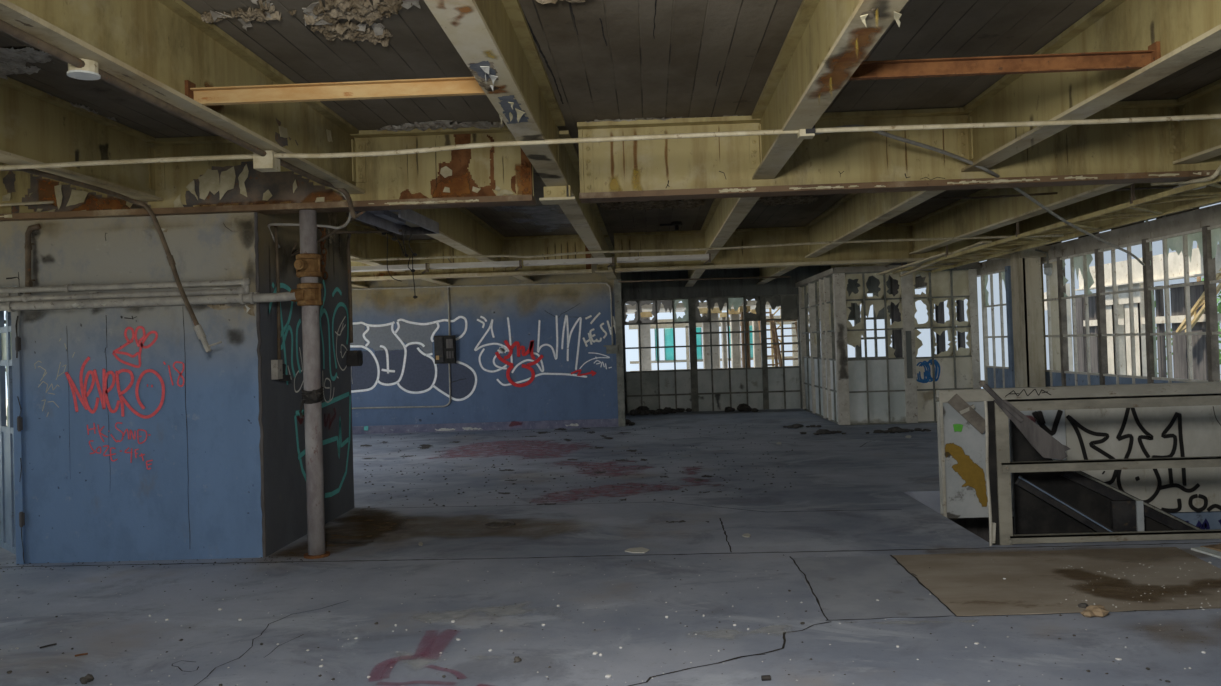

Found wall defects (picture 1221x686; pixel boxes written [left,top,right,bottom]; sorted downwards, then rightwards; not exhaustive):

spalling [201,0,421,47]
corrosion [811,2,888,97]
peeling [369,61,529,205]
peeling [0,171,151,218]
peeling [174,161,346,244]
peeling [947,176,1097,184]
leakage [325,510,568,553]
crack [172,600,348,686]
crack [628,555,1081,686]
leakage [1056,569,1221,602]